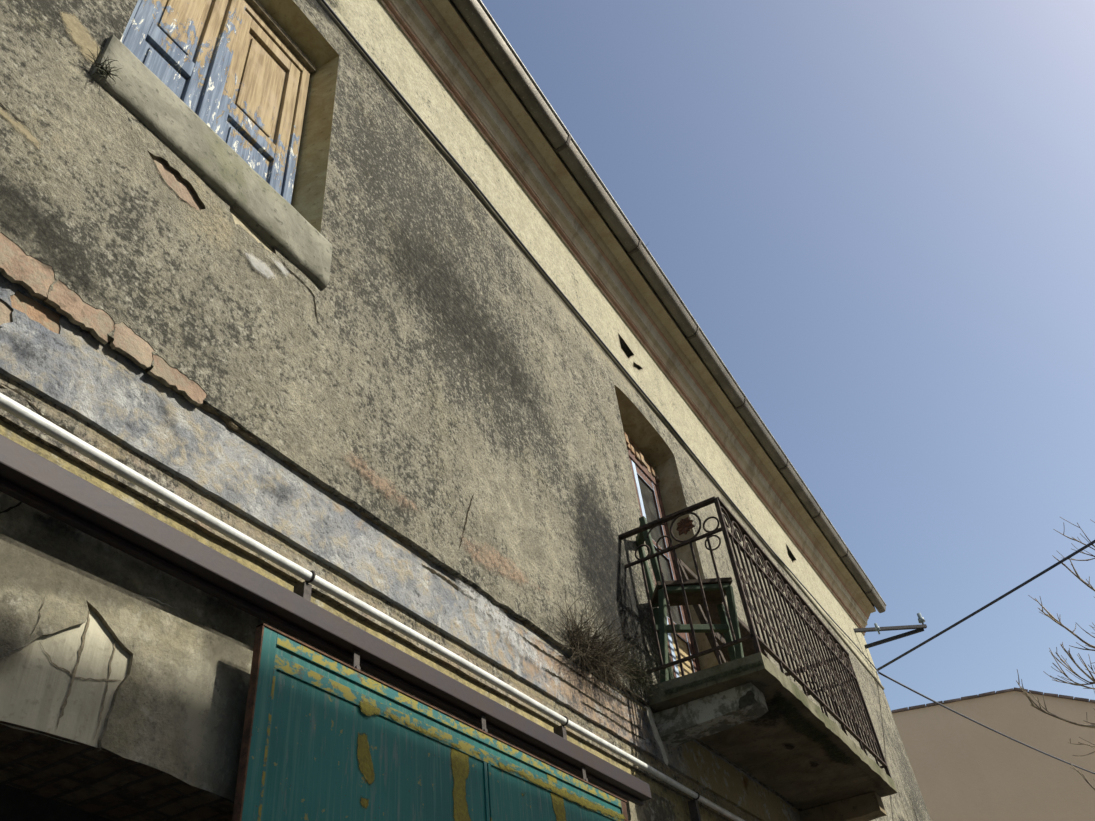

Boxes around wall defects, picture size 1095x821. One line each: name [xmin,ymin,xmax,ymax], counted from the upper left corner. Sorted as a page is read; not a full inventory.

peeling [0,108,40,148]
spalling [148,151,205,211]
flaking render [0,232,207,406]
water stain [393,233,533,402]
water stain [0,514,126,598]
water stain [577,479,643,666]
peeling [357,733,375,785]
peeling [360,701,481,821]
peeling [499,762,625,821]